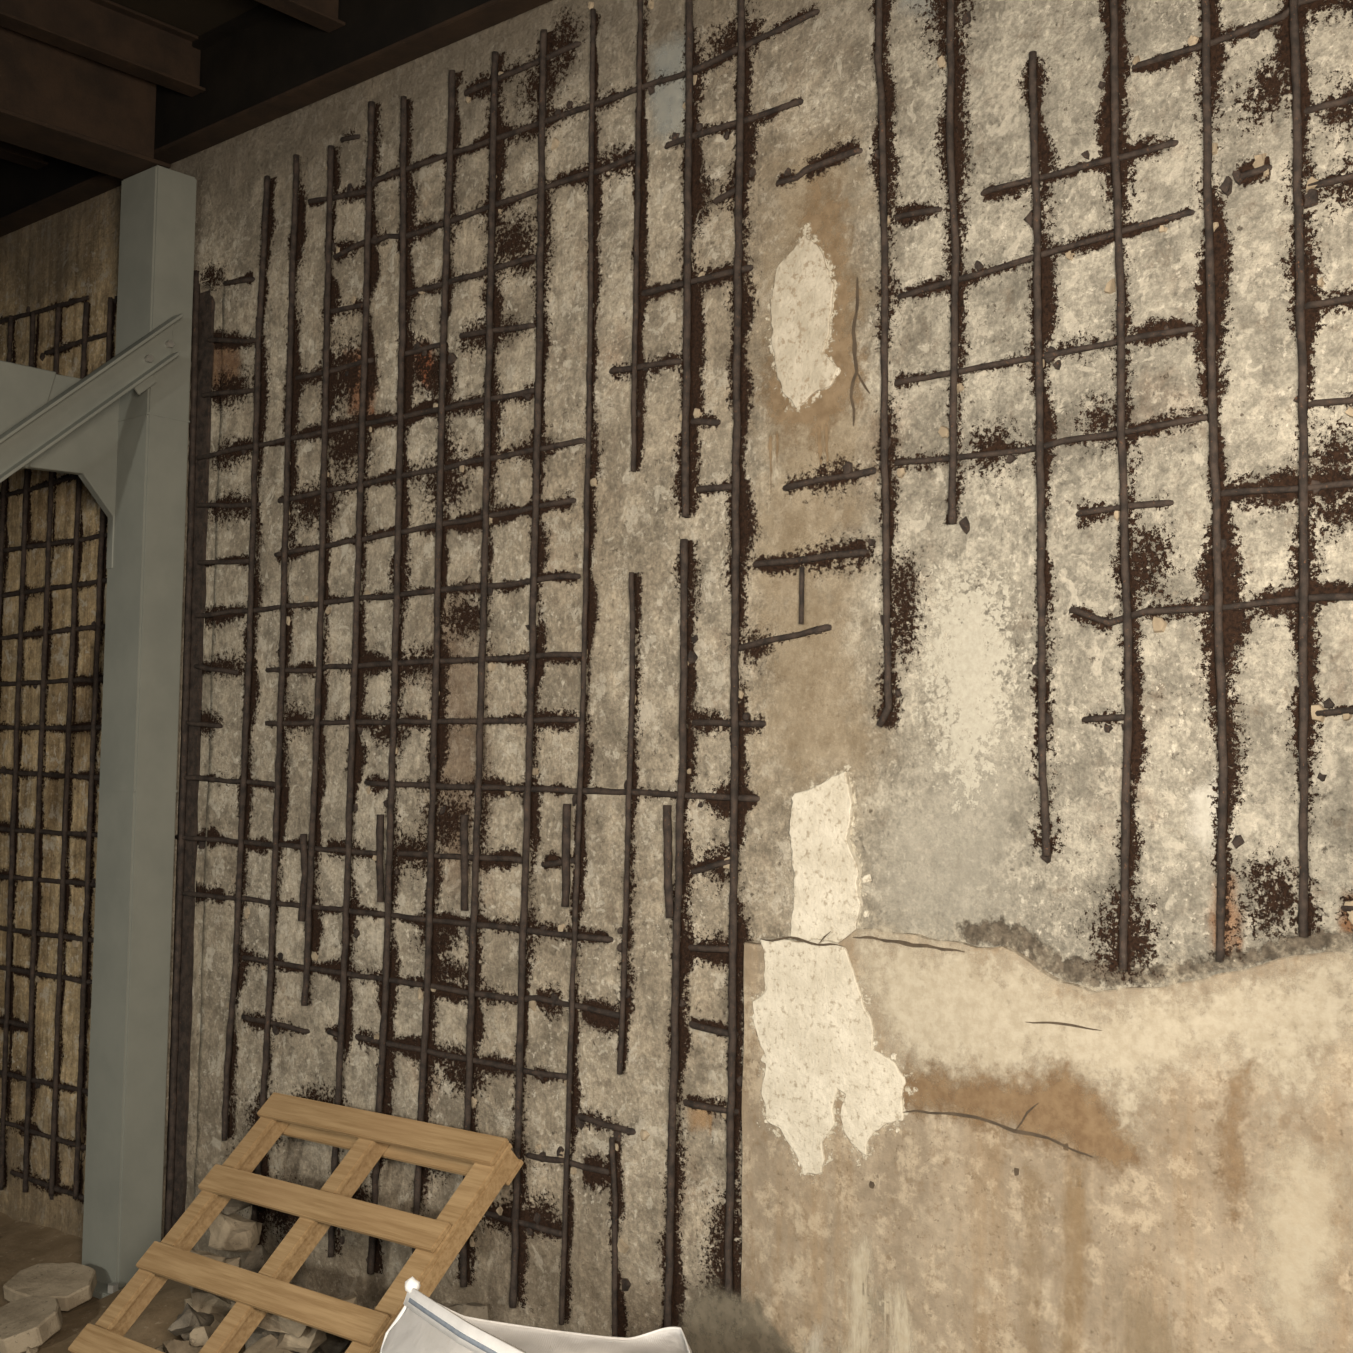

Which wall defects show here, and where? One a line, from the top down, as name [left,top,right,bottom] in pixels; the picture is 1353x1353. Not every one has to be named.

spalling [775,136,863,189]
spalling [0,293,117,379]
peeling [764,223,846,412]
rust [441,591,493,649]
spalling [0,469,108,1204]
crack [761,931,964,952]
crack [1027,1022,1102,1031]
rust [291,1071,352,1106]
crack [903,1103,1092,1157]
damp [903,1062,1139,1167]
rust [351,1175,380,1202]
rust [239,1206,299,1245]